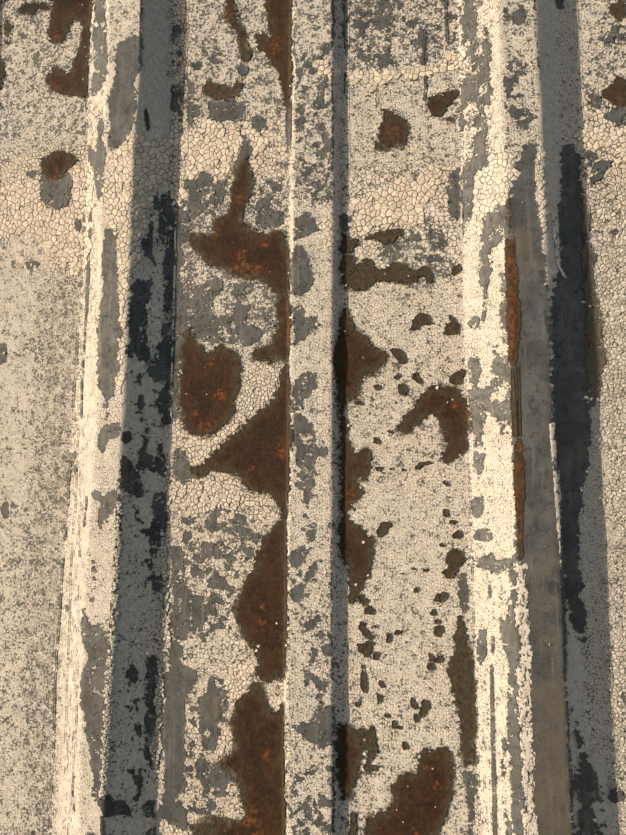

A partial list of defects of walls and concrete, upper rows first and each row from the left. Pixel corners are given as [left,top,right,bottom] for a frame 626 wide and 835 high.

rust [16,0,94,102]
crack [0,112,269,394]
peeling [74,0,274,835]
rust [173,155,294,835]
peeling [287,371,335,835]
rust [331,308,472,693]
rust [349,615,478,835]
peeling [353,0,493,237]
crack [316,151,551,247]
peeling [457,143,625,835]
crack [573,123,626,528]
crack [605,550,626,835]